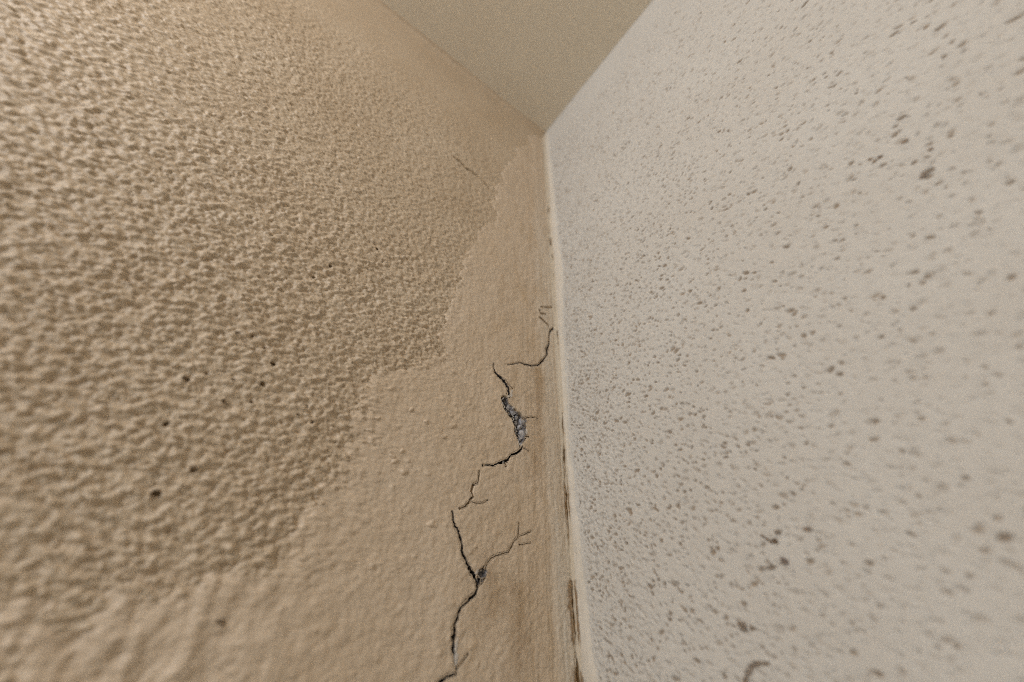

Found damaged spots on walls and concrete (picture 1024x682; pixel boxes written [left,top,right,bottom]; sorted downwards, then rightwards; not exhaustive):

crack [436,306,553,682]